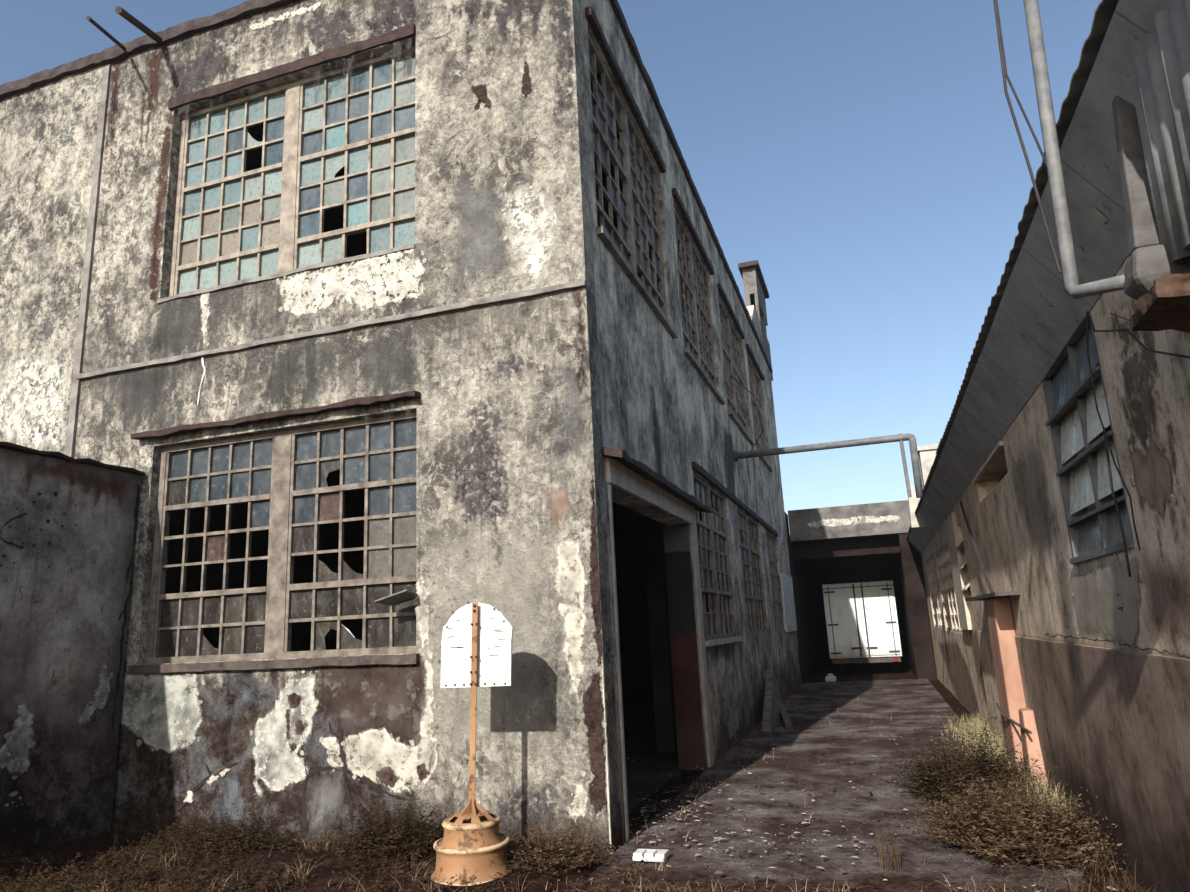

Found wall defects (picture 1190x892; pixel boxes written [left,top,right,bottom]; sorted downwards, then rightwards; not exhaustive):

corrosion [140,49,174,316]
flaking render [276,248,427,318]
damp [1111,300,1177,475]
flaking render [0,704,36,807]
flaking render [79,658,206,752]
flaking render [250,576,445,796]